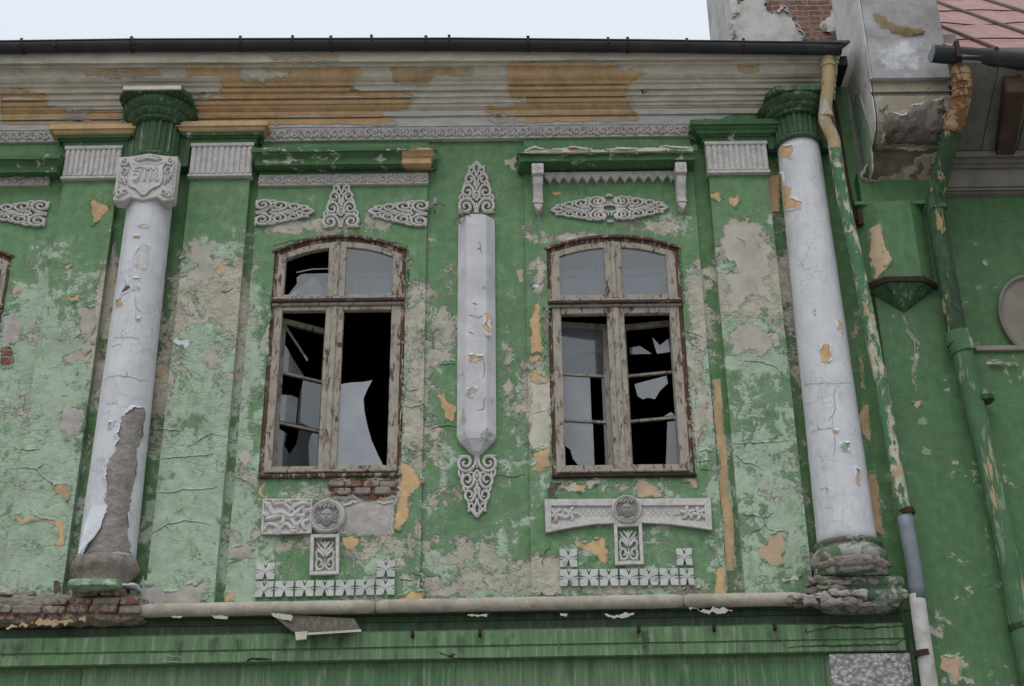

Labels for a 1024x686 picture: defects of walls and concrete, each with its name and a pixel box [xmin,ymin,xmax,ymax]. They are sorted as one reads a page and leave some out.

peeling [728,0,806,41]
peeling [185,54,474,128]
peeling [486,61,649,124]
peeling [709,191,776,357]
peeling [866,222,893,280]
peeling [528,304,601,499]
flaking render [78,405,146,556]
crack [154,474,255,493]
flaking render [328,464,426,551]
peeling [676,379,737,614]
spalling [0,576,209,630]
flaking render [759,531,876,613]